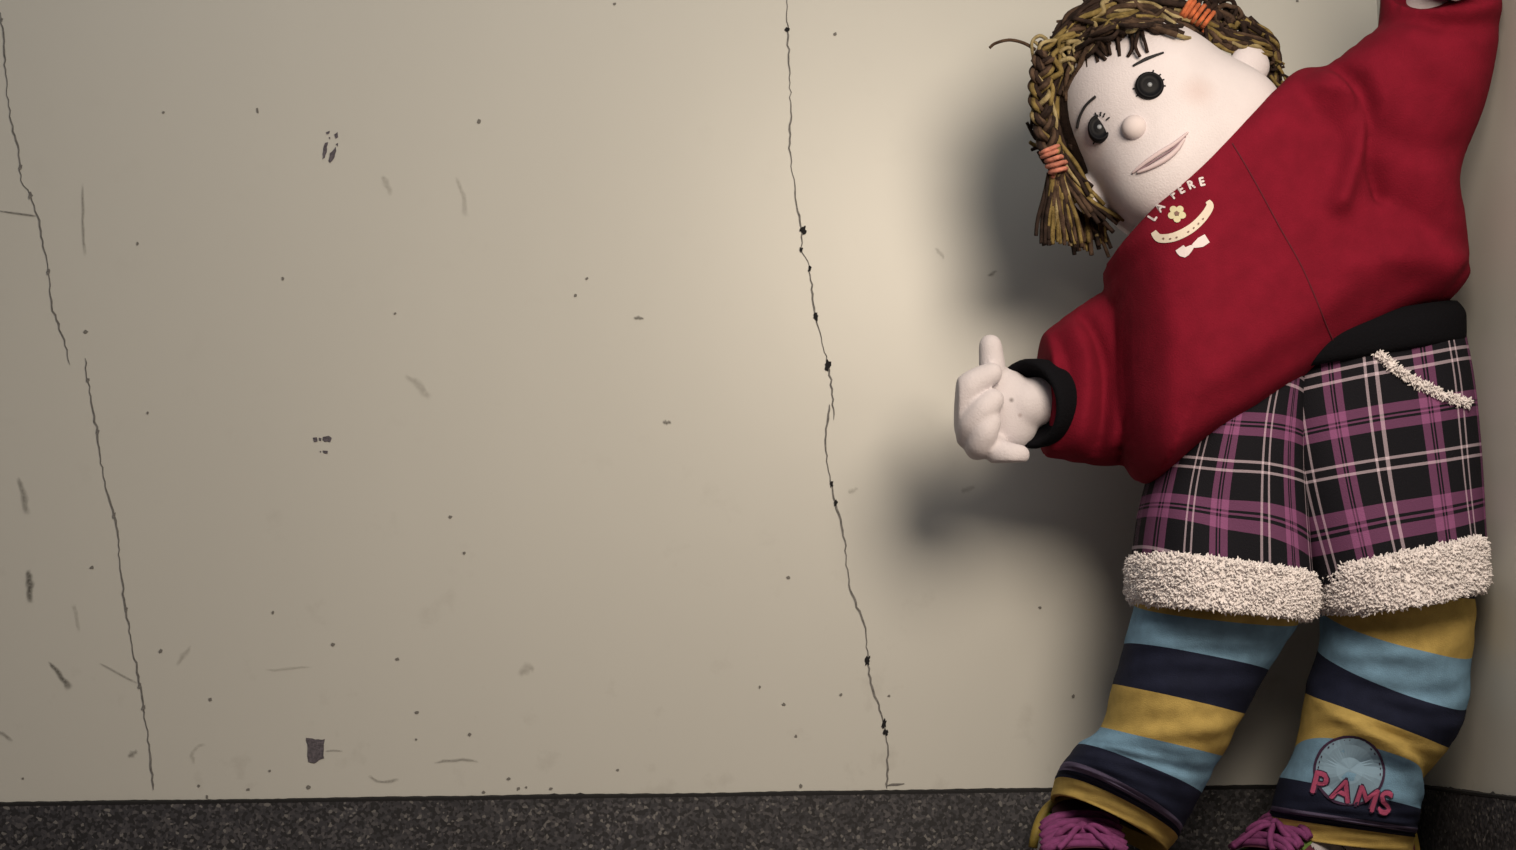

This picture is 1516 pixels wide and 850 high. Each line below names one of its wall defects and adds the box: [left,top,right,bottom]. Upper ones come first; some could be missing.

crack [0,13,154,790]
crack [785,0,904,788]